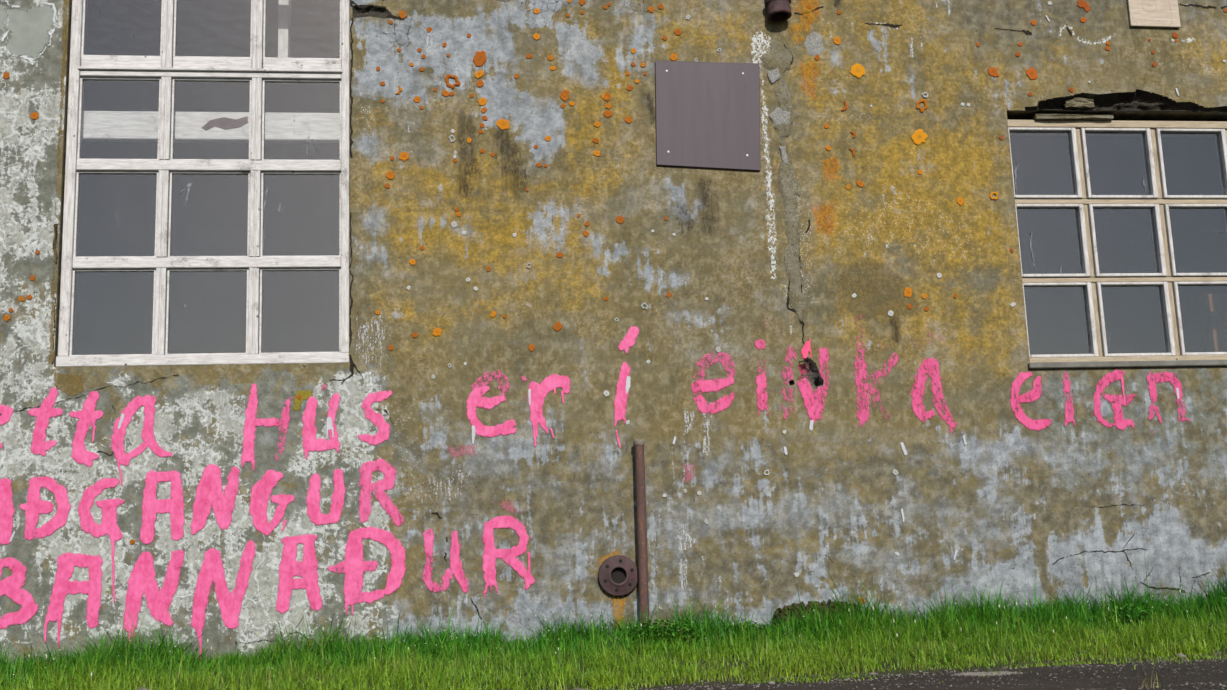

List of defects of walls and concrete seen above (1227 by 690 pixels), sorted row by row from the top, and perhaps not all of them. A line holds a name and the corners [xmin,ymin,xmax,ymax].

peeling [0,0,57,65]
leakage [751,30,788,299]
crack [784,219,822,381]
rust [603,590,628,631]